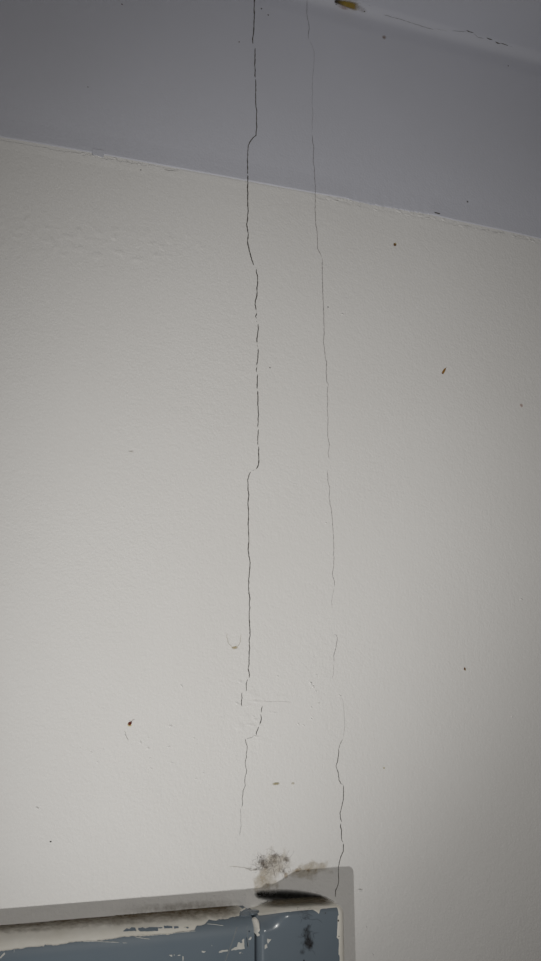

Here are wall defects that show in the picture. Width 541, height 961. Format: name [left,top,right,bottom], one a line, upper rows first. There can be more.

crack [240,0,262,813]
crack [335,741,344,897]